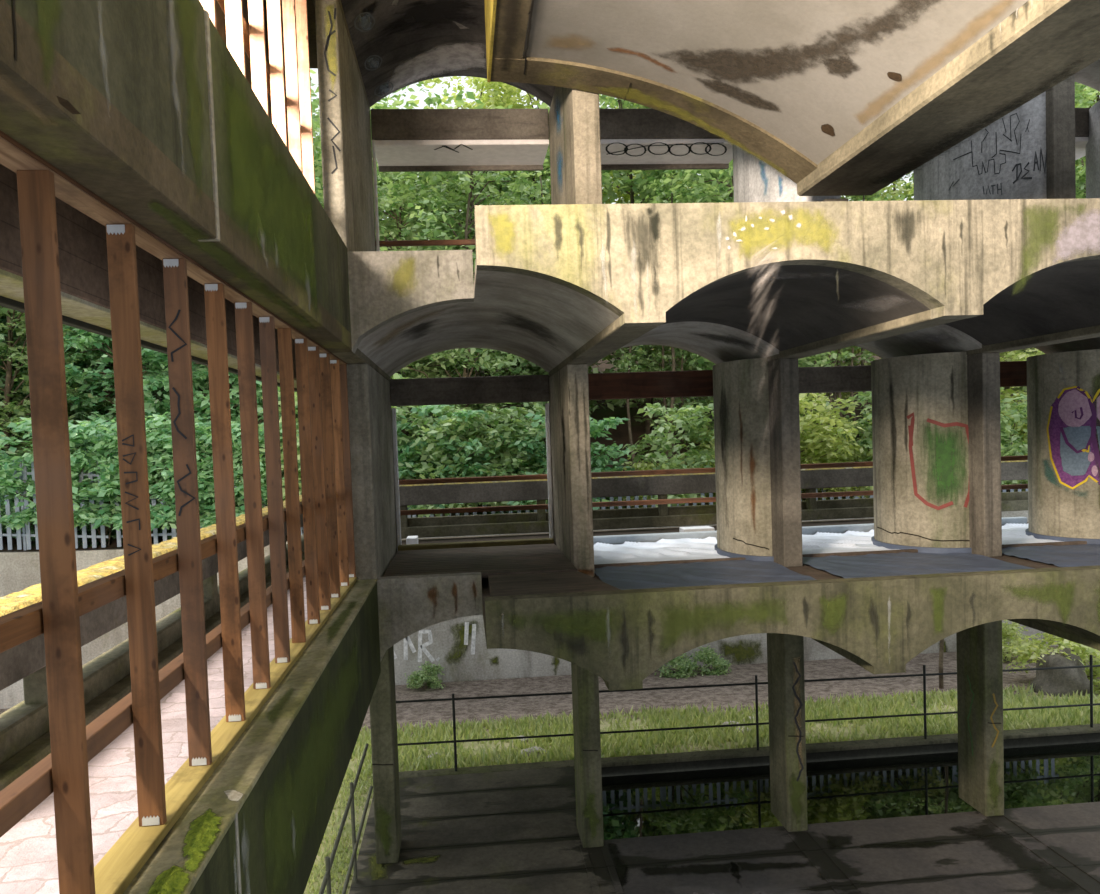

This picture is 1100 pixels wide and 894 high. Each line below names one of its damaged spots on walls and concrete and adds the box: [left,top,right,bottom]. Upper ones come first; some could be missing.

crack [11,0,19,61]
damp [661,0,937,111]
damp [859,1,1028,122]
damp [627,208,658,294]